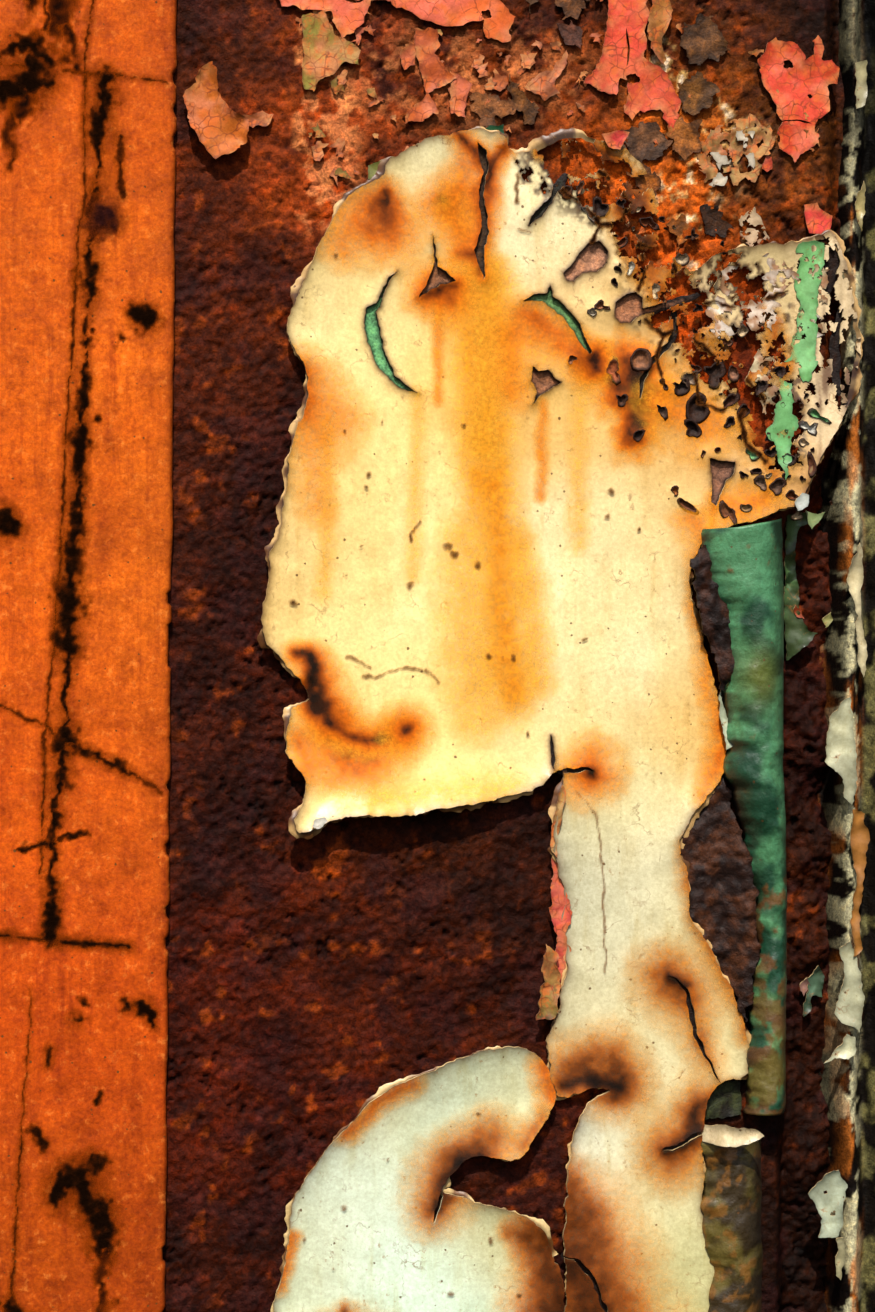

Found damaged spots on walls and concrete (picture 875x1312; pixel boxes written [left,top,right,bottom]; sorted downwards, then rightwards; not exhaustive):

rust [0,24,127,199]
rust [295,354,358,513]
rust [325,130,832,728]
rust [285,641,513,798]
peeling [257,0,870,1312]
rust [565,739,621,798]
rust [689,603,726,803]
rust [638,846,747,1188]
crack [670,976,718,1080]
rust [412,1032,650,1234]
rust [43,1151,120,1312]
rust [501,1163,653,1312]